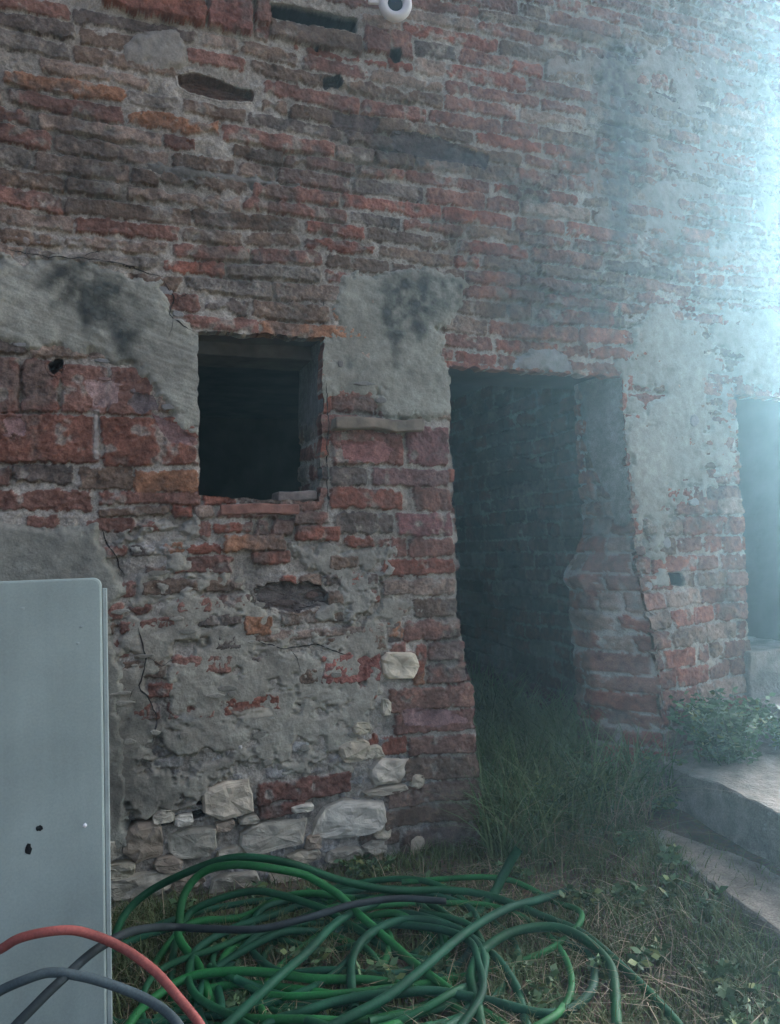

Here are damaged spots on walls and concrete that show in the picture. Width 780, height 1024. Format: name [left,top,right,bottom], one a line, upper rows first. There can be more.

water stain [46,262,137,351]
peeling [0,252,200,438]
crack [8,249,195,332]
water stain [382,277,448,345]
peeling [613,300,780,592]
crack [129,626,174,742]
spalling [109,510,422,820]